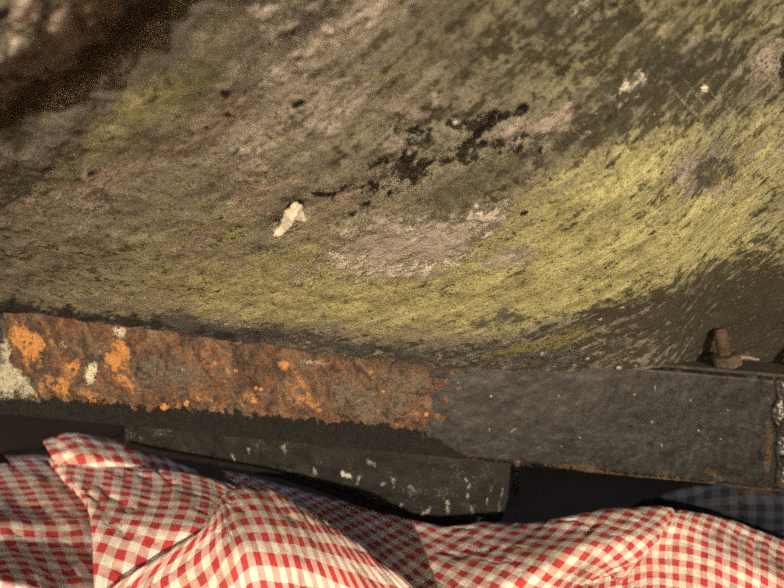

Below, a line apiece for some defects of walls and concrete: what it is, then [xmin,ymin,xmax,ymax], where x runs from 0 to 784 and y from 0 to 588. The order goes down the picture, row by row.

damp [290,68,451,172]
damp [482,100,593,154]
rust [0,313,472,431]
damp [149,305,629,373]